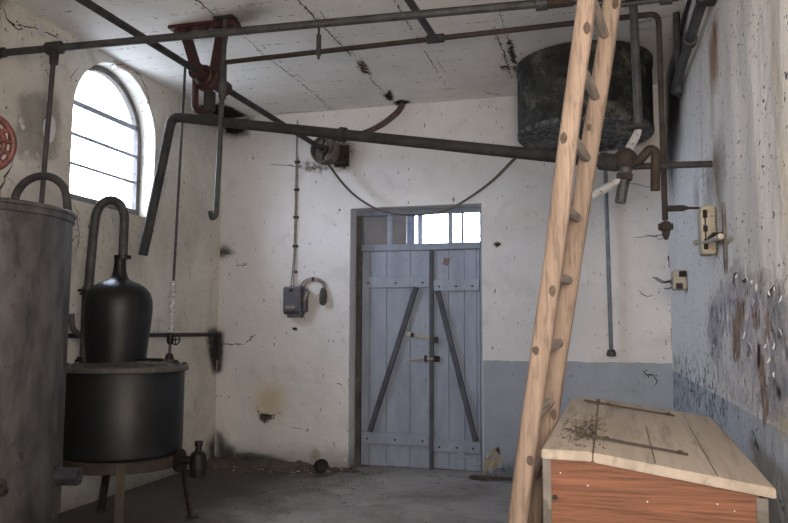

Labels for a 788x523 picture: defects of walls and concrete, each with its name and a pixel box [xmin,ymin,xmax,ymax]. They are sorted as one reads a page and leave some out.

crack [0,6,74,51]
crack [241,35,332,114]
crack [298,0,395,106]
mould [206,326,225,377]
peeling [672,258,788,459]